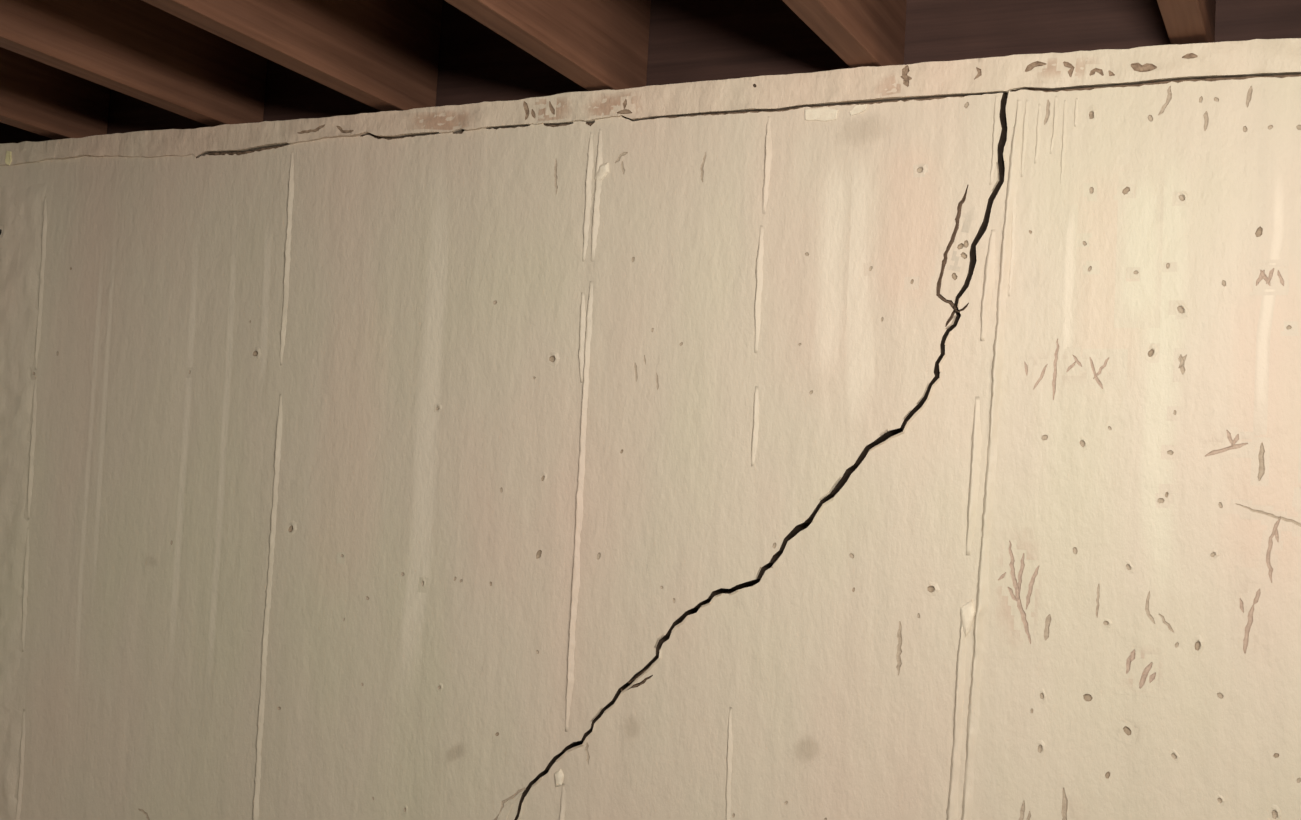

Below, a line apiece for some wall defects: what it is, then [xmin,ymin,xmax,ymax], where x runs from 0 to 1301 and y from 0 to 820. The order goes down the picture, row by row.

crack [196,144,290,158]
crack [360,74,1301,820]